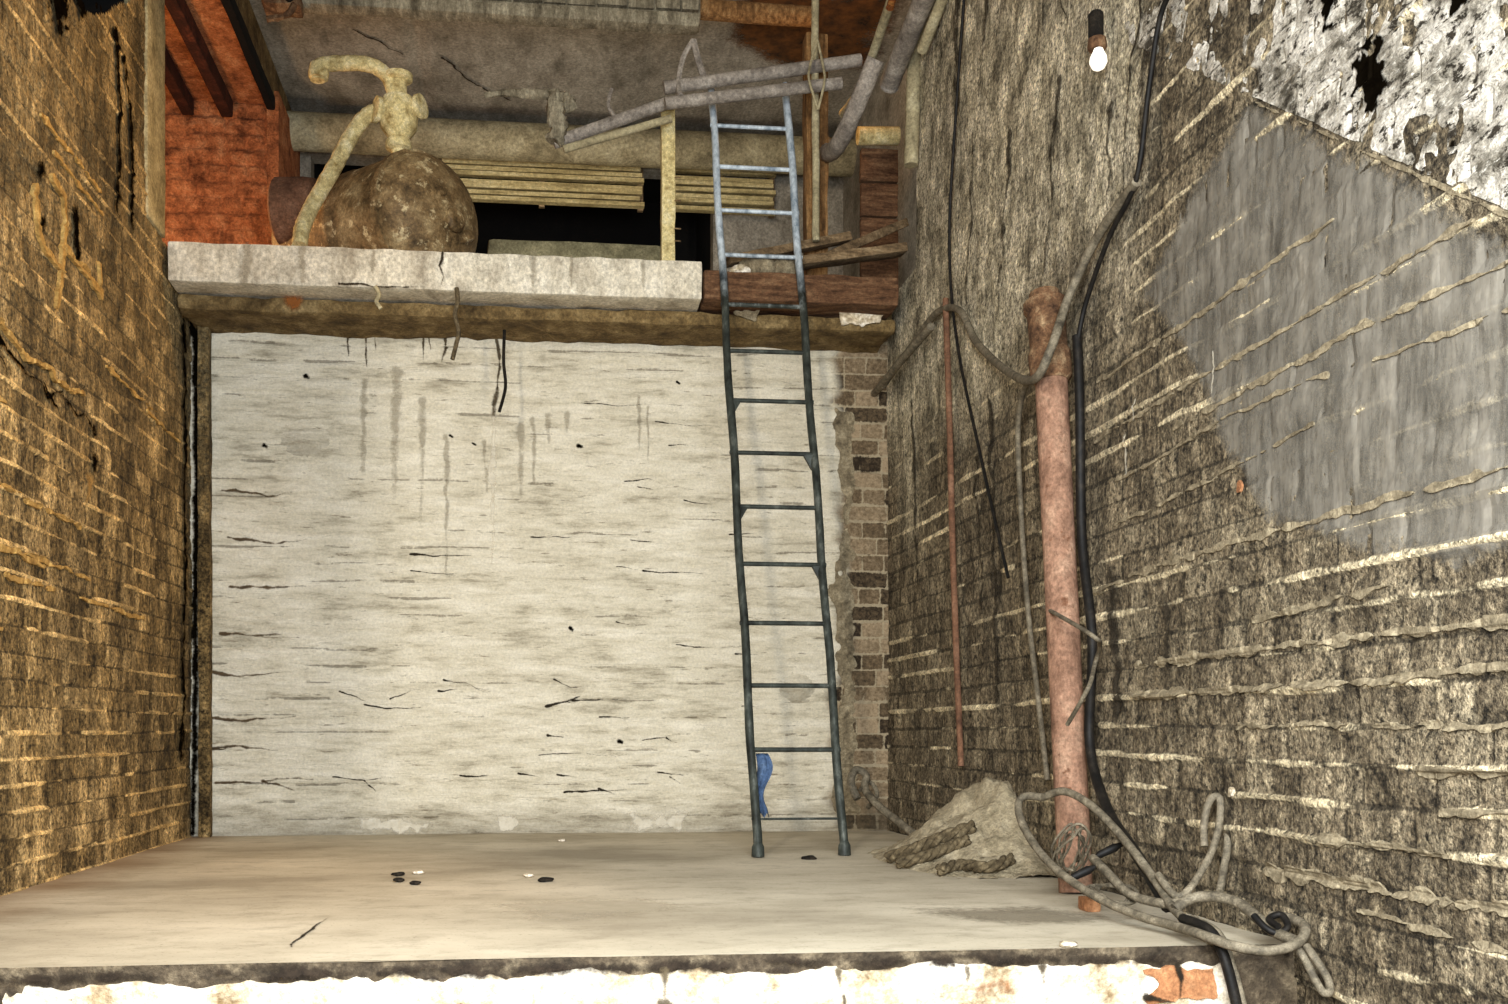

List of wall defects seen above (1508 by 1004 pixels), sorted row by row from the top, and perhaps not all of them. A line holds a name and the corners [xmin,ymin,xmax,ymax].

crack [111,26,136,227]
rust [728,0,899,69]
peeling [1126,0,1508,210]
damp [489,339,501,549]
spalling [828,408,861,815]
peeling [2,960,1230,1004]